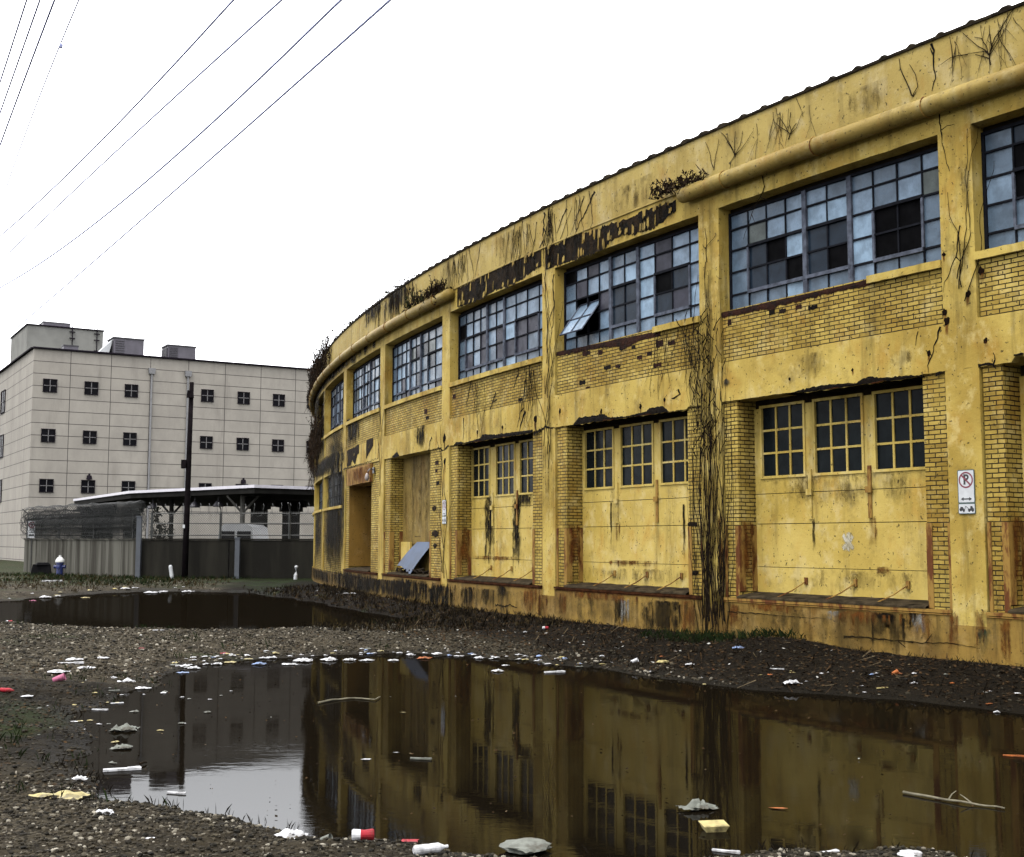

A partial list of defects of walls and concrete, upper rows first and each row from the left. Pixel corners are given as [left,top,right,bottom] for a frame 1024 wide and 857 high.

peeling [457,200,676,308]
damp [312,342,506,606]
damp [512,494,530,560]
rust [743,521,755,575]